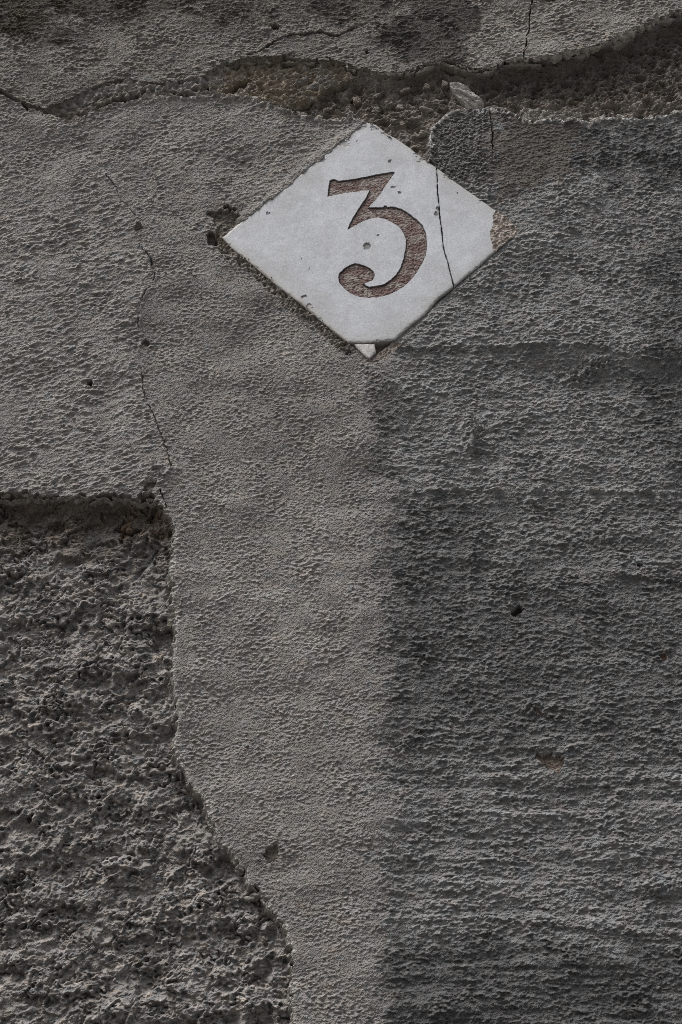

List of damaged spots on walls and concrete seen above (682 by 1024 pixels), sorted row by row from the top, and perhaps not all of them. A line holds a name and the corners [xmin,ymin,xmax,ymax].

spalling [98,9,682,162]
crack [523,0,600,59]
crack [437,174,455,289]
crack [105,173,172,508]
spalling [0,488,294,1024]